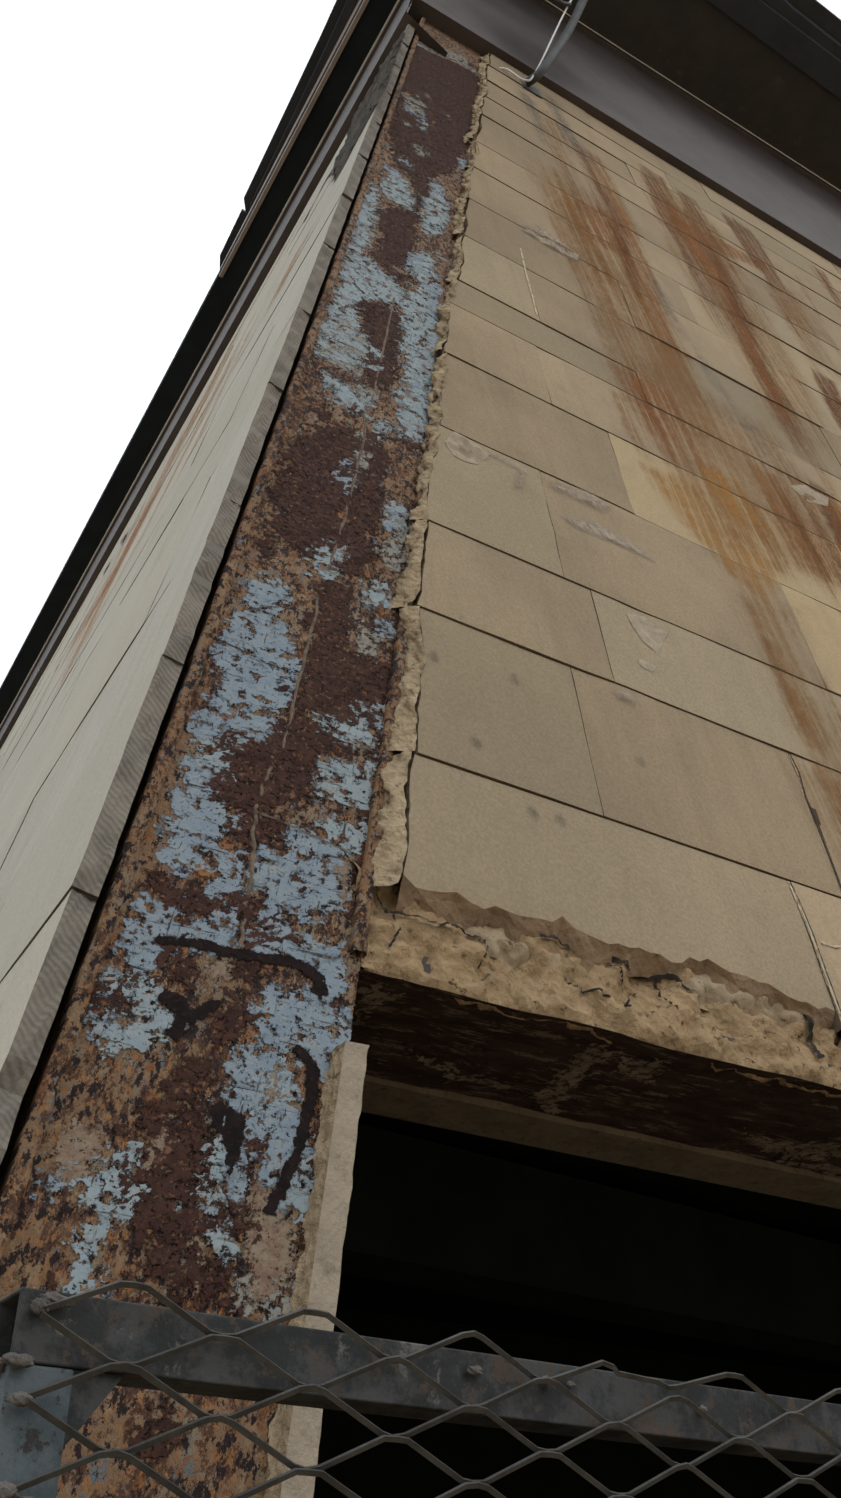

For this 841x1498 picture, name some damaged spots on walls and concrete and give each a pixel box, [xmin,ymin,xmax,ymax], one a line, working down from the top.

corrosion [68,338,238,653]
corrosion [320,40,478,393]
corrosion [549,145,841,592]
corrosion [46,399,425,1318]
spalling [79,25,841,1322]
crack [787,881,841,1059]
crack [789,754,841,887]
peeling [29,1141,152,1297]
corrosion [123,1391,187,1464]